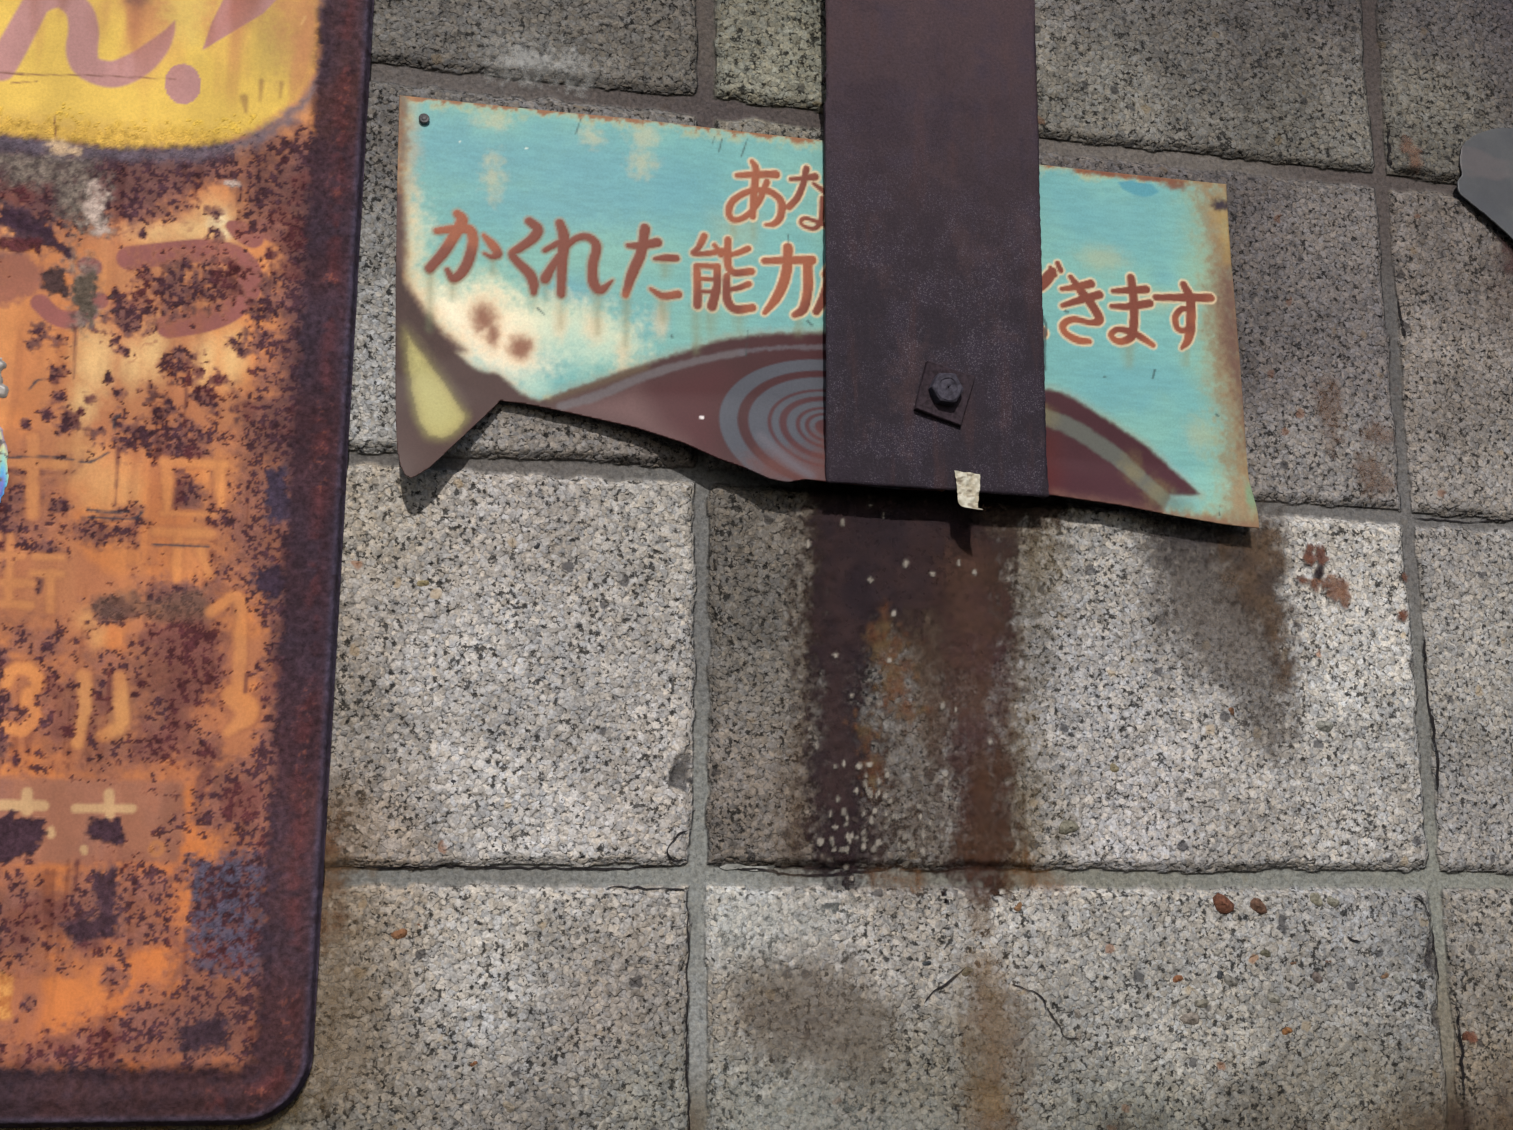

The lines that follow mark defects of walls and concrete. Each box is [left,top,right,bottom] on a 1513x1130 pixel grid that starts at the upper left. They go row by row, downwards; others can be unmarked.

rust [797,481,1066,902]
damp [1147,520,1298,751]
rust [1298,543,1351,608]
crack [1423,640,1440,802]